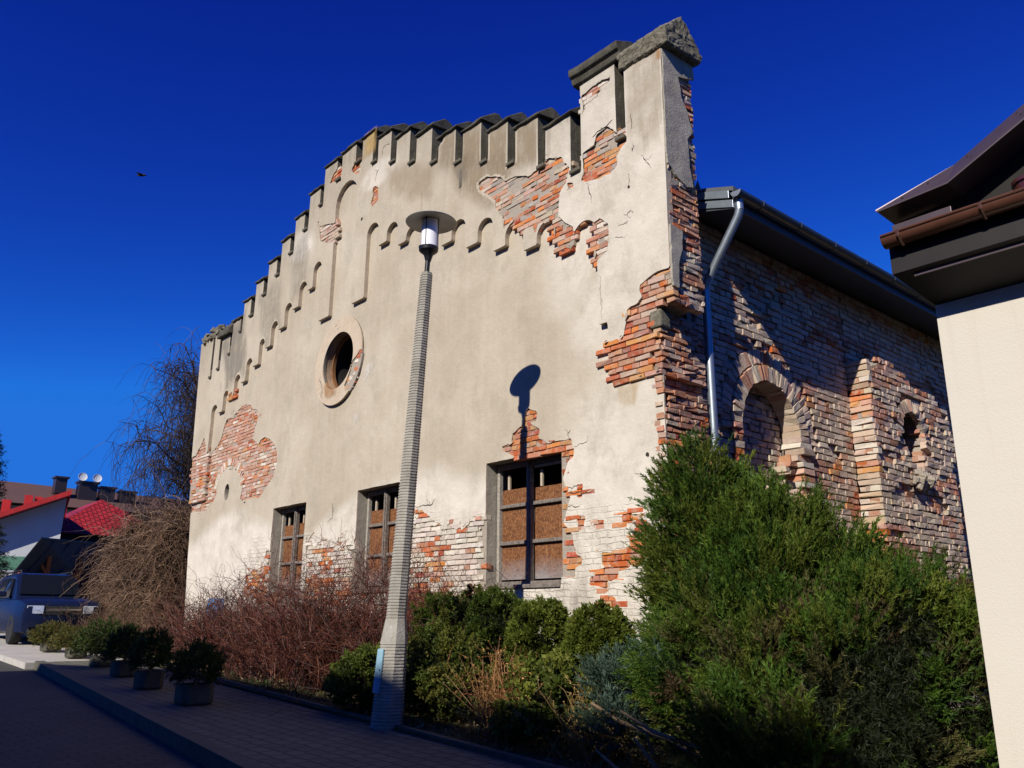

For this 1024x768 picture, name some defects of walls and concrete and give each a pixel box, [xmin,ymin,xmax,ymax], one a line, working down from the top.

spalling [578,76,610,116]
spalling [319,219,342,243]
spalling [330,157,362,183]
spalling [478,127,627,269]
spalling [596,268,679,387]
spalling [189,389,277,512]
spalling [244,548,278,609]
spalling [304,529,360,617]
spalling [407,505,491,616]
spalling [503,407,650,607]